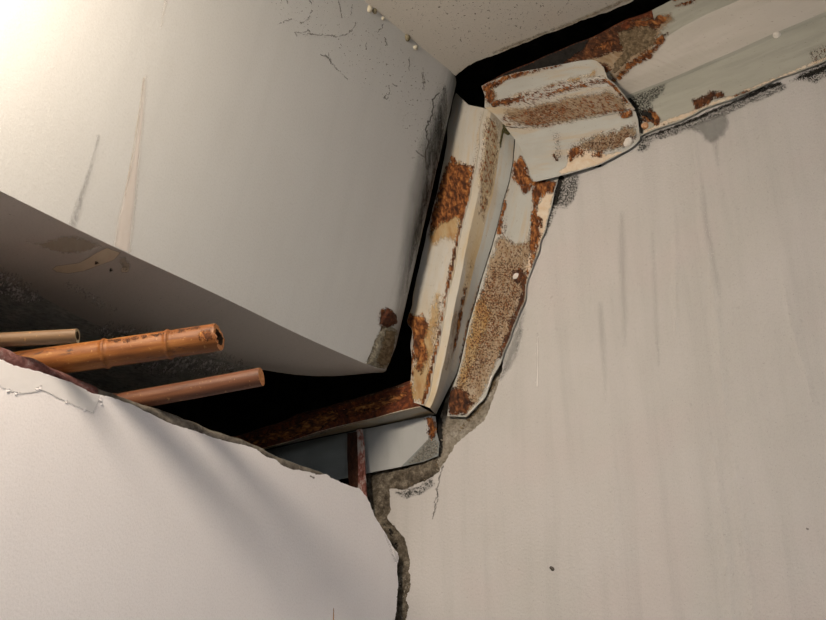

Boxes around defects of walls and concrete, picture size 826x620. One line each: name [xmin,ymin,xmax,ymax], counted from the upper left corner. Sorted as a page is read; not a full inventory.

mould [794,64,826,83]
crack [416,75,439,166]
leakage [638,82,785,151]
rust [246,15,672,445]
spalling [93,322,159,339]
spalling [366,307,398,369]
peeling [0,361,103,413]